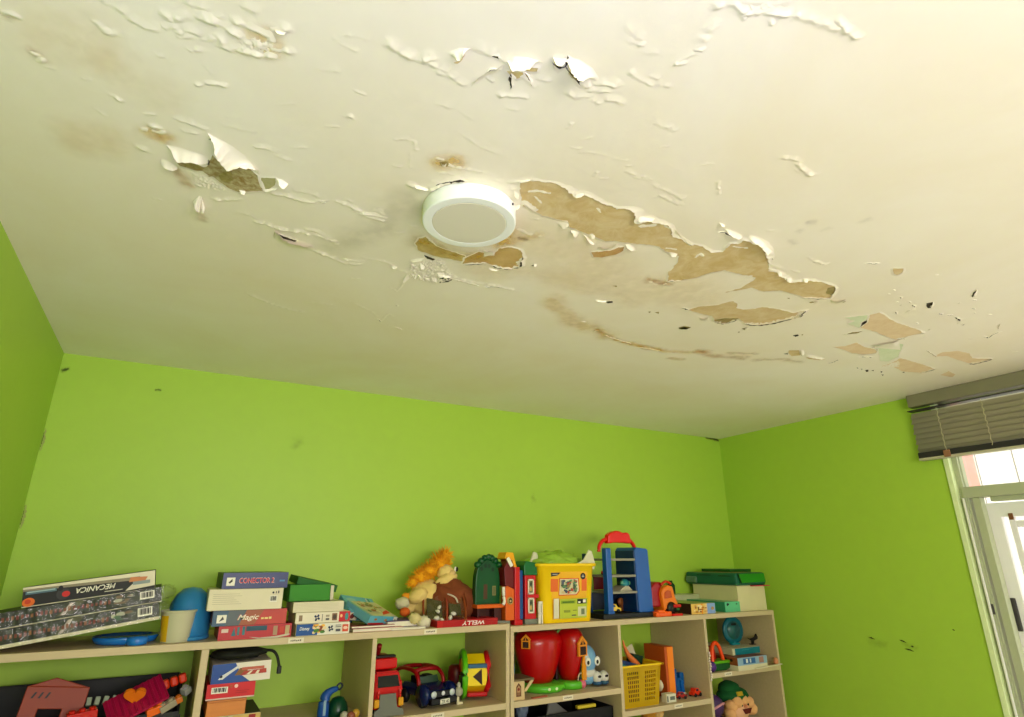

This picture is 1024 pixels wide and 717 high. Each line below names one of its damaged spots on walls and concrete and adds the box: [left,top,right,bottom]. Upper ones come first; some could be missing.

peeling [378,32,628,113]
peeling [138,110,288,213]
peeling [403,156,484,193]
peeling [250,208,537,287]
peeling [504,174,846,333]
peeling [833,311,995,377]